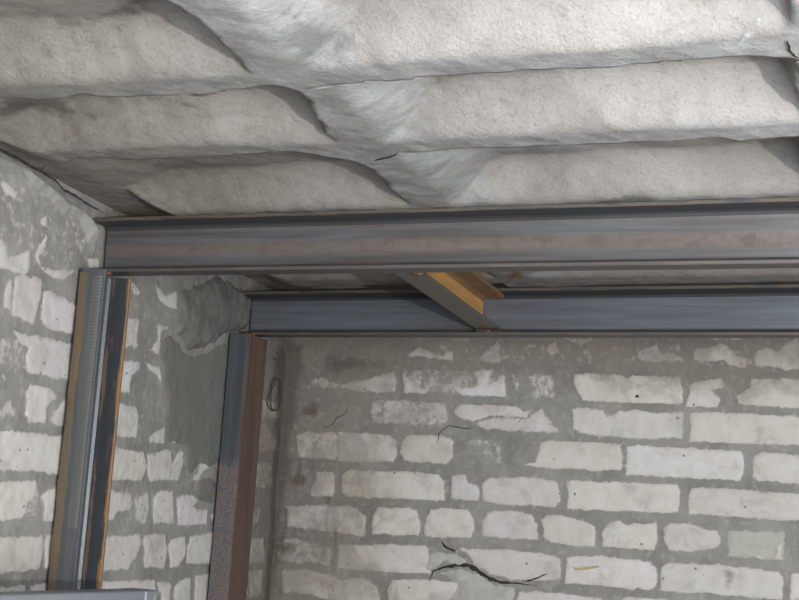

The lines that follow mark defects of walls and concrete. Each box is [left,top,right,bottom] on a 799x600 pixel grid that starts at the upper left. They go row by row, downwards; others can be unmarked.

crack [786,41,799,62]
crack [0,149,105,214]
crack [429,542,546,586]